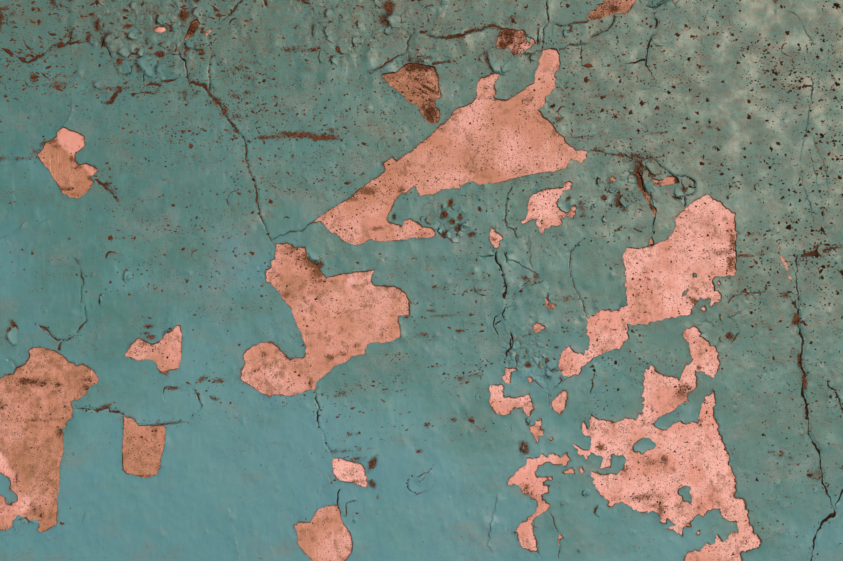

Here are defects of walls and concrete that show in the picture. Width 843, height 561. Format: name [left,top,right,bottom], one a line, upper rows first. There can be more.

crack [542,0,615,63]
peeling [37,127,98,198]
crack [14,32,318,245]
peeling [313,26,588,245]
peeling [0,347,99,532]
peeling [122,416,166,478]
peeling [125,325,182,375]
peeling [240,243,410,397]
peeling [488,176,761,561]
crack [727,284,770,344]
crack [791,242,843,561]
peeling [295,505,353,561]